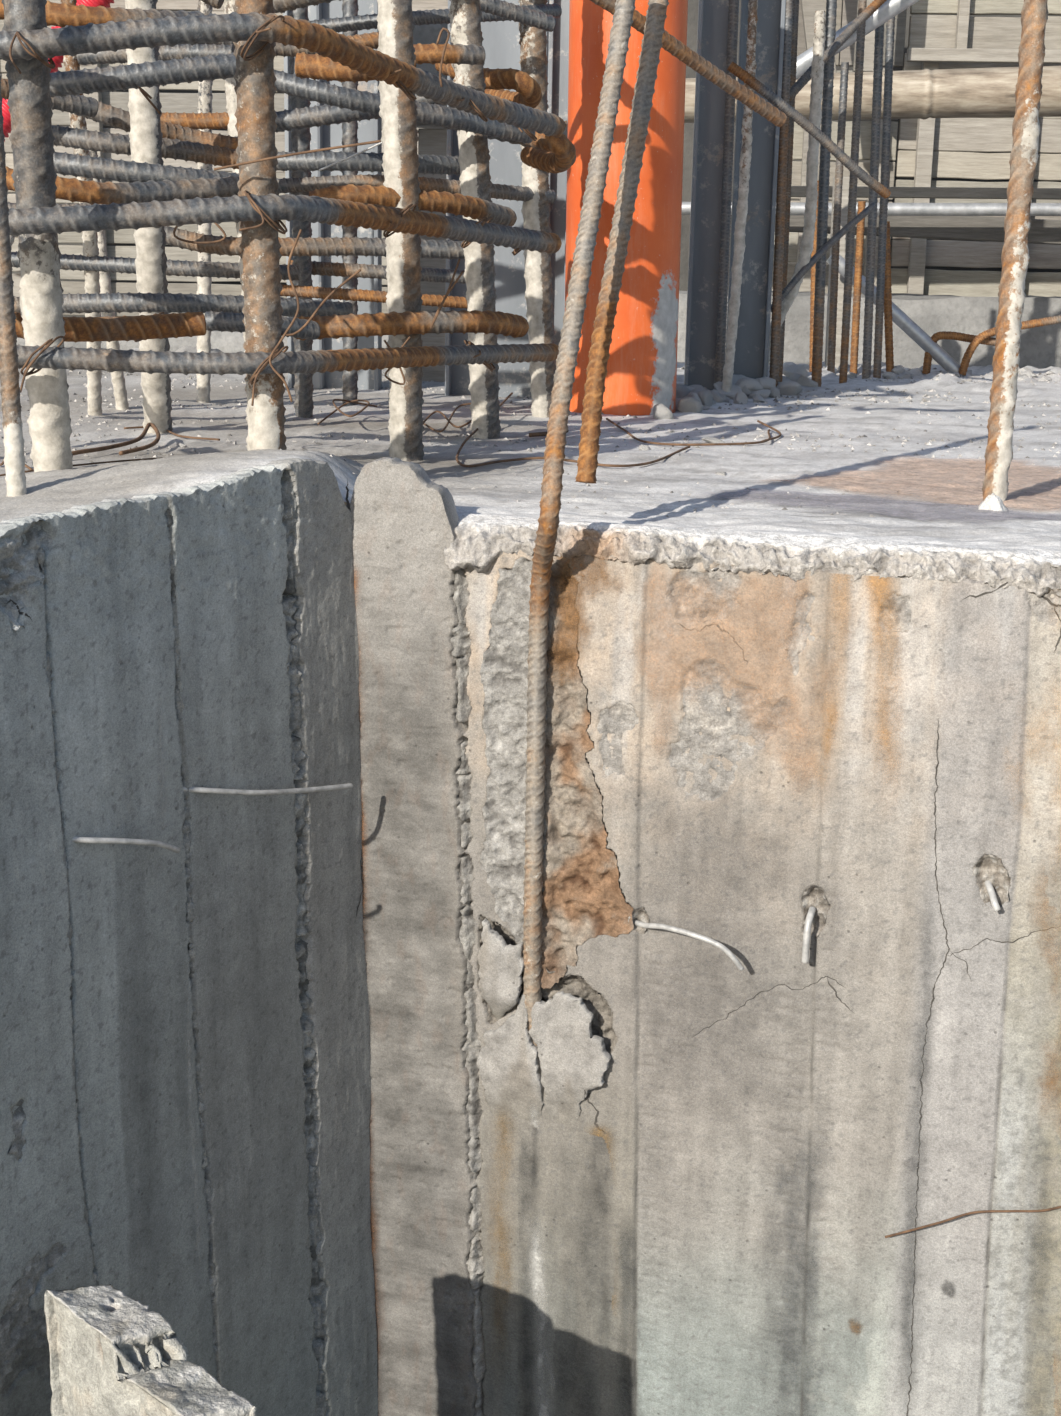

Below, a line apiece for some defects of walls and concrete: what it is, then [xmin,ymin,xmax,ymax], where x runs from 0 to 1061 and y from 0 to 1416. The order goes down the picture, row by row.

spalling [0,520,52,630]
spalling [444,513,539,573]
rust [555,555,607,677]
spalling [477,519,1061,1127]
crack [691,976,854,1038]
crack [906,718,1060,1416]
peeling [0,1243,67,1395]
damp [524,1237,549,1416]